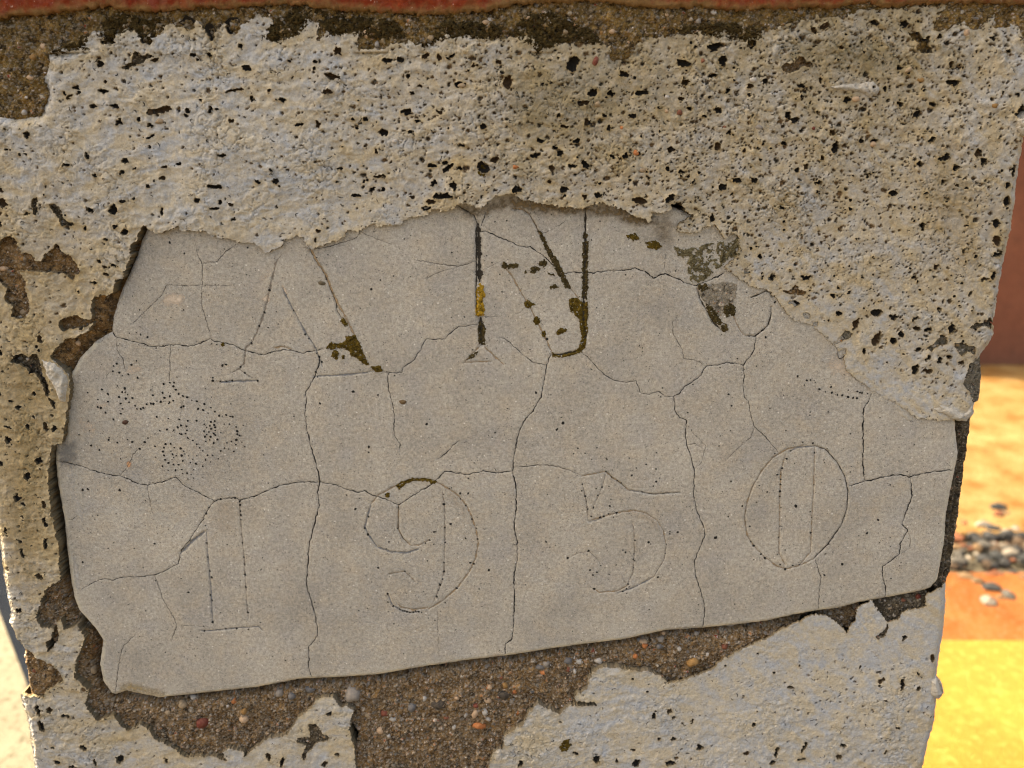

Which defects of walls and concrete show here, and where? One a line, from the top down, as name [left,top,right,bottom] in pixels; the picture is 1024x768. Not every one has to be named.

spalling [0,0,1024,120]
spalling [52,204,87,231]
spalling [0,227,147,406]
spalling [105,197,135,241]
spalling [194,185,235,221]
crack [414,206,723,286]
spalling [783,275,811,307]
spalling [837,309,981,402]
crack [57,243,580,675]
crack [583,318,778,624]
crack [849,395,952,595]
spalling [36,417,971,768]